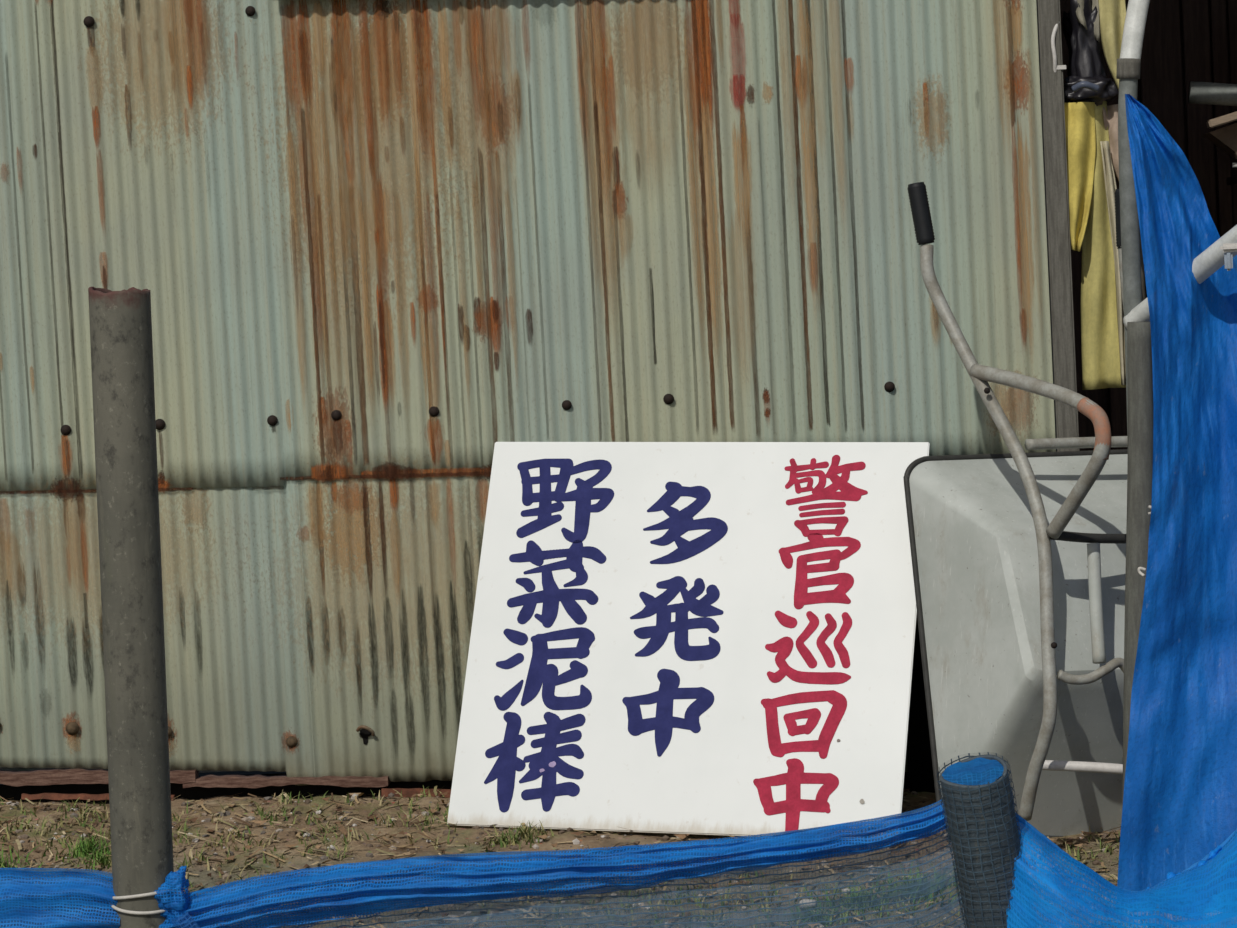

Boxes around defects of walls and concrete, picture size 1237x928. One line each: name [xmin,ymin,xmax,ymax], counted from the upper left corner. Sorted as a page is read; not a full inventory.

corrosion [92,106,100,144]
corrosion [168,0,206,105]
corrosion [266,0,520,590]
corrosion [578,0,629,442]
corrosion [684,0,734,428]
corrosion [923,83,933,130]
corrosion [1001,0,1033,330]
leakage [7,574,44,661]
corrosion [0,436,97,626]
leakage [67,614,104,691]
corrosion [158,436,193,491]
leakage [307,542,473,740]